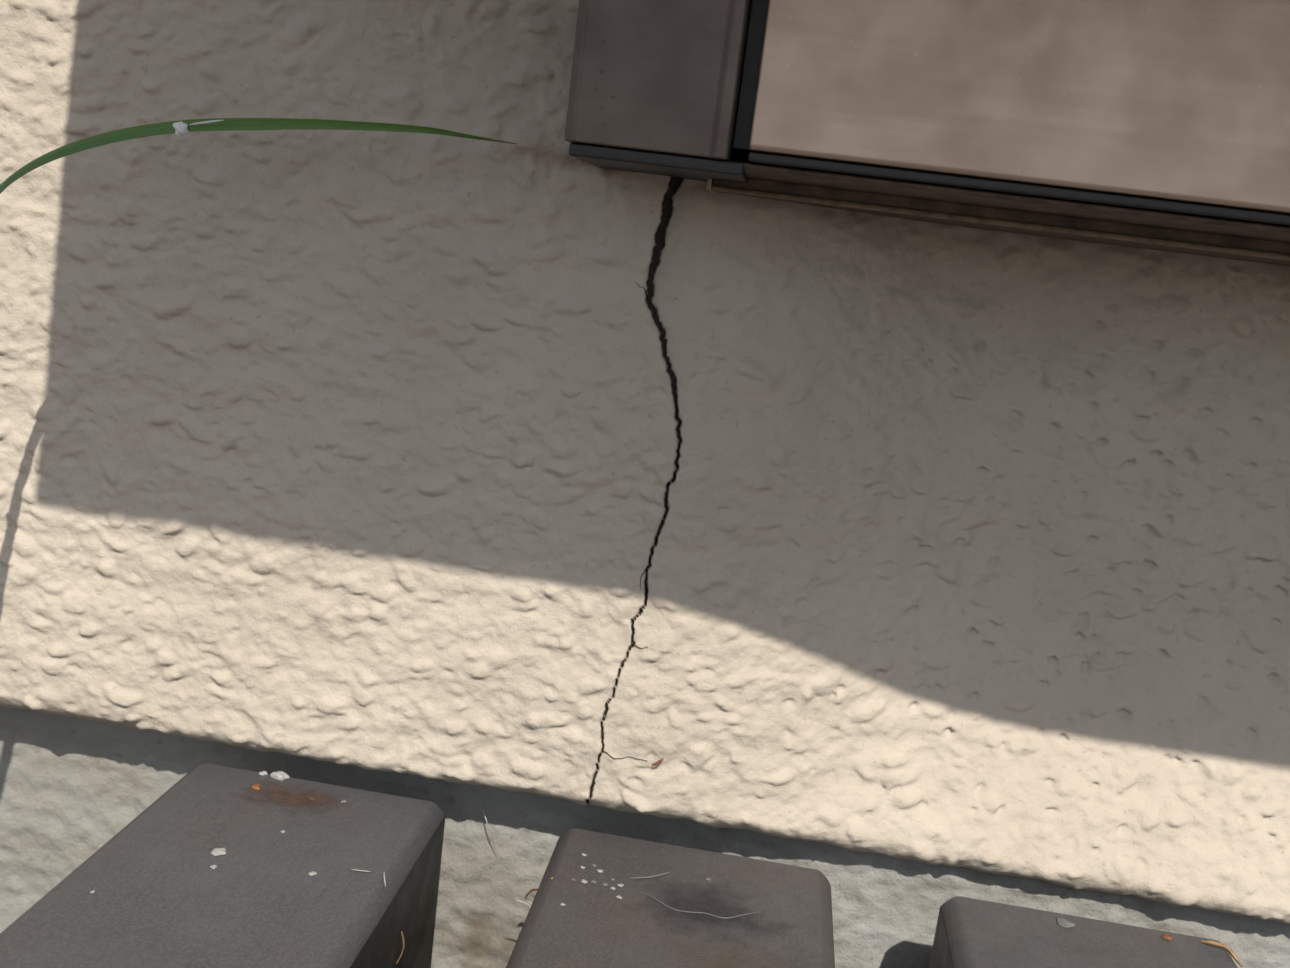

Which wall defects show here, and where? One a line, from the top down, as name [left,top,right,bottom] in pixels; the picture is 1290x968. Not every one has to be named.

crack [585,177,682,807]